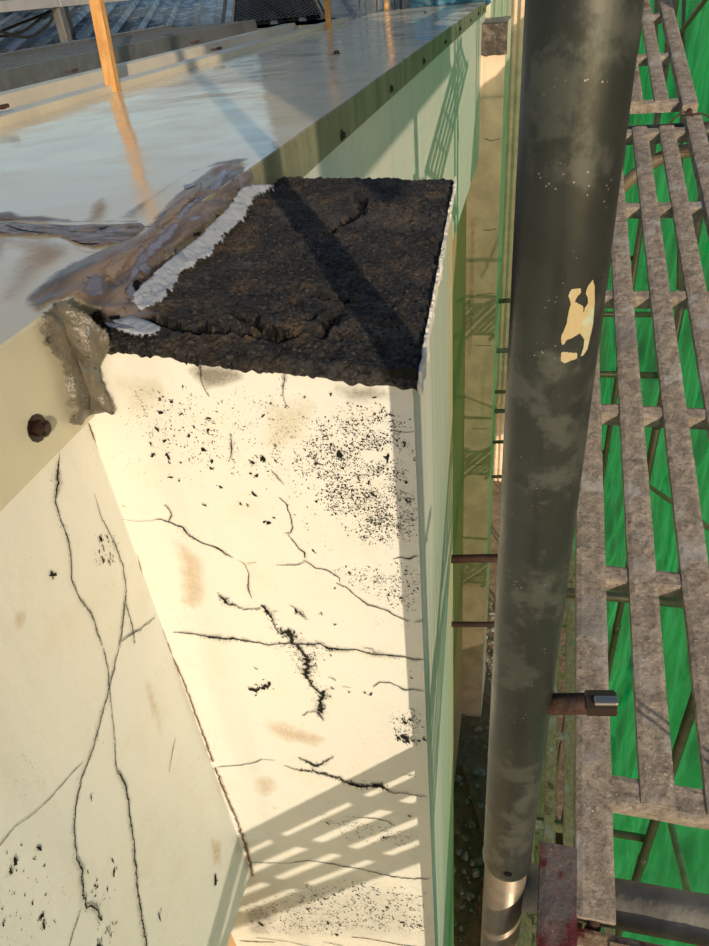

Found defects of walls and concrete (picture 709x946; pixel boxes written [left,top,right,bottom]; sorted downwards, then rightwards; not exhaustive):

spalling [90,176,457,396]
damp [128,385,417,545]
damp [334,562,420,611]
crack [0,460,426,946]
damp [245,881,428,937]